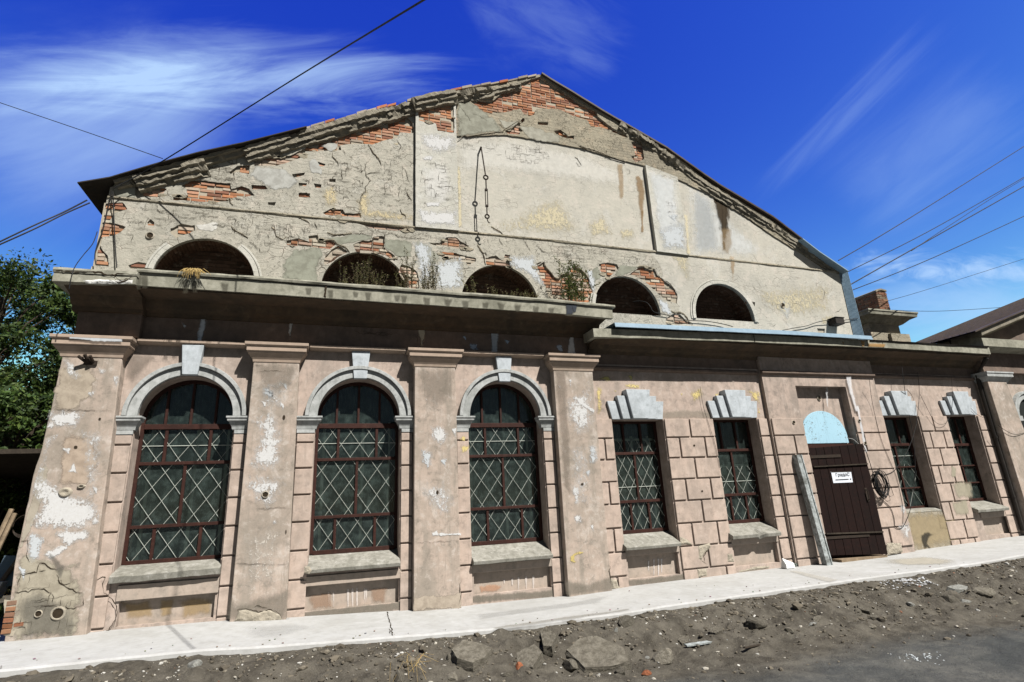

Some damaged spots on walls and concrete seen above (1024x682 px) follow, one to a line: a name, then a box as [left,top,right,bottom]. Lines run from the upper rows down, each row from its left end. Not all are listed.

spalling [135,106,457,204]
spalling [472,78,643,162]
spalling [93,203,127,267]
spalling [171,225,195,238]
spalling [287,167,618,302]
leakage [713,184,730,249]
spalling [630,266,689,325]
peeling [47,410,79,472]
peeling [249,383,287,503]
peeling [567,377,610,427]
peeling [29,437,99,559]
crack [13,540,117,633]